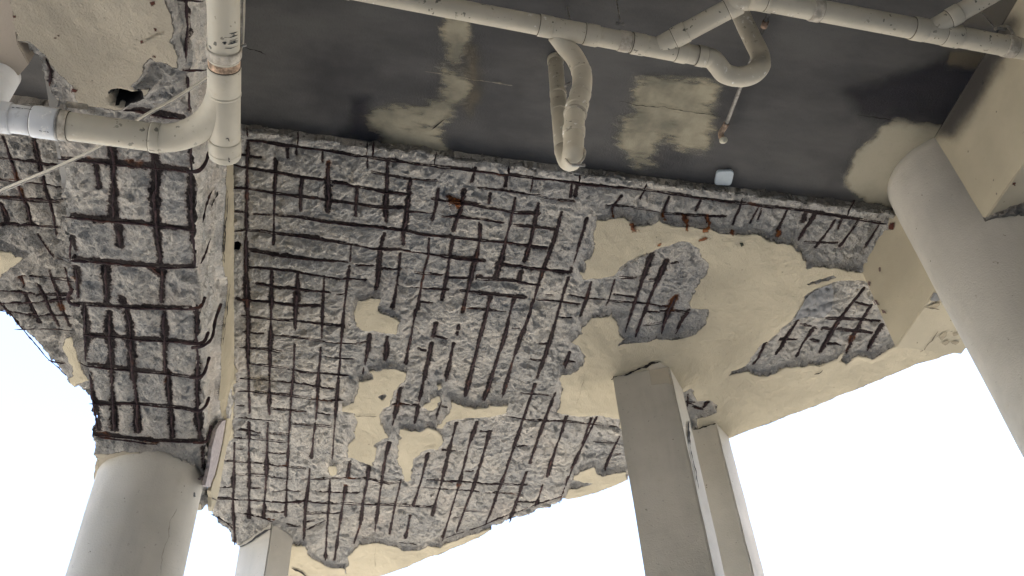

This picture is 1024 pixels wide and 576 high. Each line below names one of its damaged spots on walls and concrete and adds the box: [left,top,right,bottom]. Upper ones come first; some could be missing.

spalling [9,0,208,124]
corrosion [446,195,461,209]
peeling [800,117,941,216]
spalling [0,68,896,574]